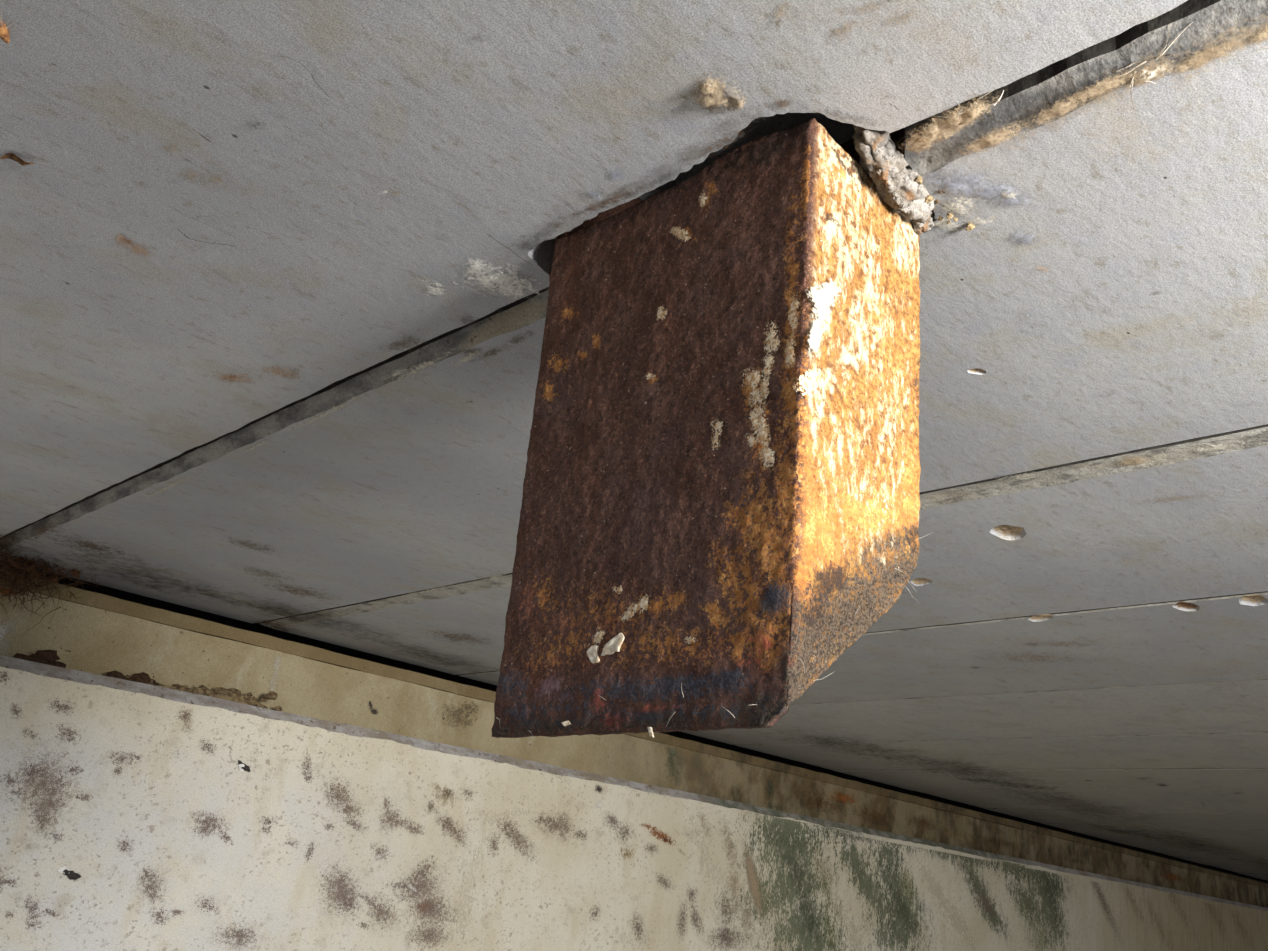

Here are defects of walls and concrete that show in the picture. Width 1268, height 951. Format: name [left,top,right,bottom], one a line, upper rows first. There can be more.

leakage [48,699,81,742]
leakage [108,750,141,775]
leakage [0,754,90,840]
leakage [192,811,233,845]
leakage [301,757,366,831]
leakage [379,797,424,834]
leakage [428,802,464,843]
leakage [5,895,59,929]
leakage [138,866,218,925]
leakage [319,811,587,948]
leakage [216,925,257,948]